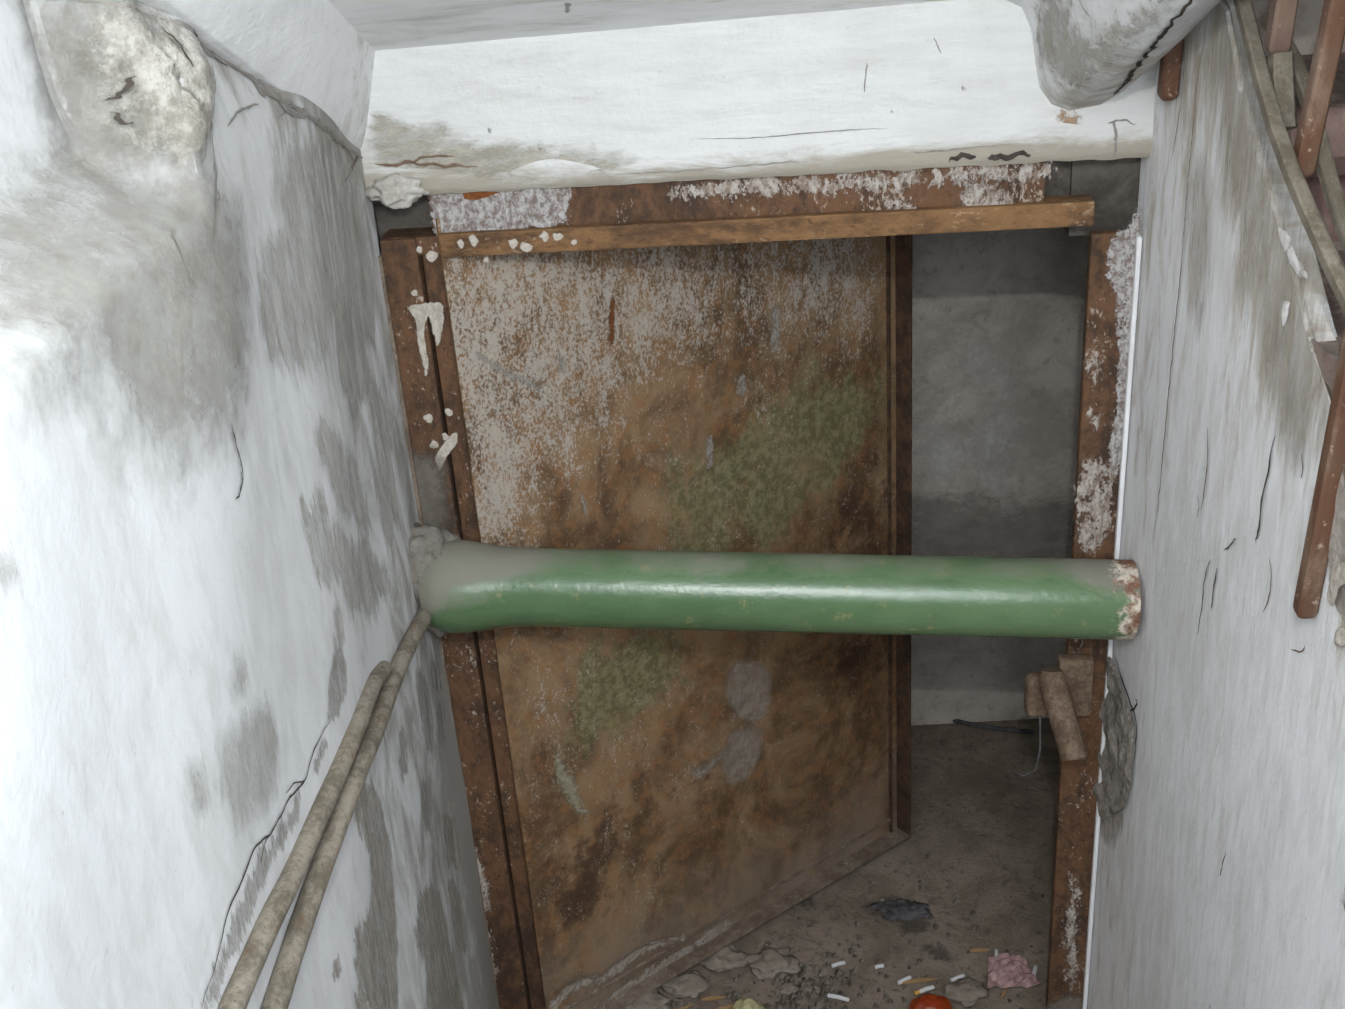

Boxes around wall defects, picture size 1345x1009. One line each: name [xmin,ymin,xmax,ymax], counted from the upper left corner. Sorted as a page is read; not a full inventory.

leakage [0,9,246,446]
crack [46,0,477,287]
leakage [256,137,398,667]
peeling [408,290,444,376]
leakage [373,115,619,175]
peeling [426,187,577,262]
rust [608,297,616,347]
peeling [667,161,1062,210]
peeling [1073,208,1142,557]
crack [1108,0,1203,542]
leakage [224,707,276,817]
crack [202,717,332,1006]